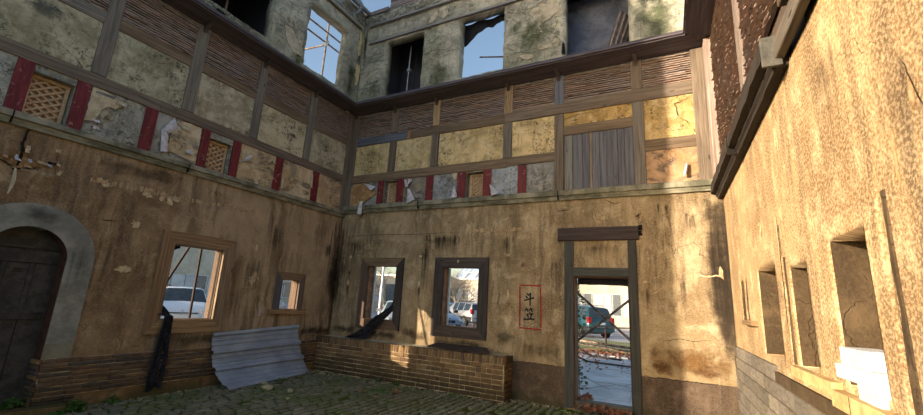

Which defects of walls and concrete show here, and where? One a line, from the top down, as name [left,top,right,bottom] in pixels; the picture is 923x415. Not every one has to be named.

leakage [327,0,458,29]
leakage [364,0,522,49]
peeling [1,145,63,176]
leakage [327,238,344,304]